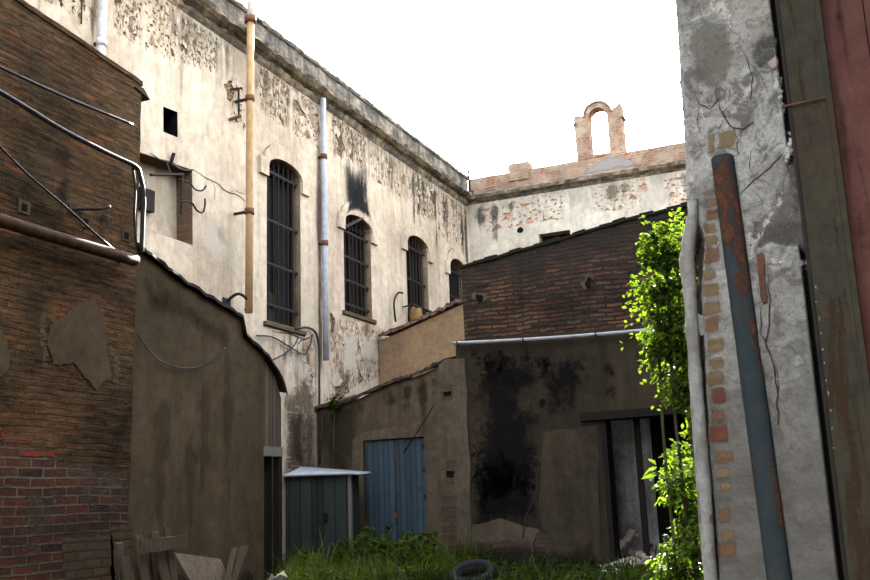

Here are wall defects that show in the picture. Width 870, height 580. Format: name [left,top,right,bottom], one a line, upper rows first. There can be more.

peeling [114,0,220,71]
crack [739,46,768,100]
crack [695,95,784,207]
peeling [481,192,565,231]
corrosion [713,154,750,296]
flaking render [695,198,735,574]